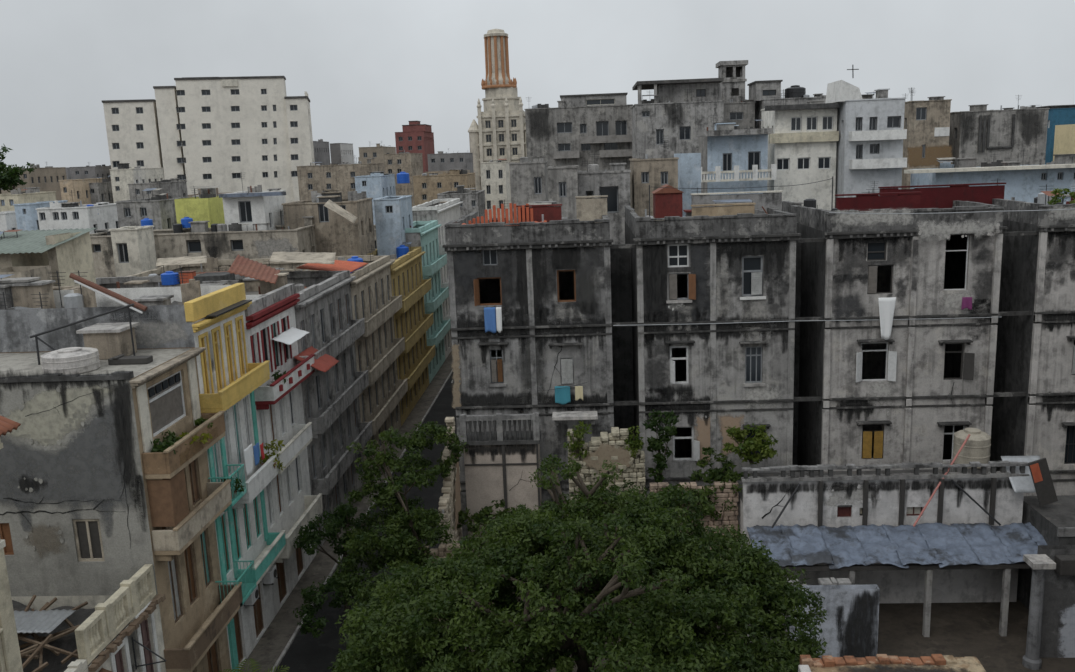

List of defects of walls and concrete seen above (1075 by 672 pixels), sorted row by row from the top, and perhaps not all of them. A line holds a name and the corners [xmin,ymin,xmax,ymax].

leakage [0,371,145,534]
crack [0,469,131,546]
peeling [1059,605,1075,658]